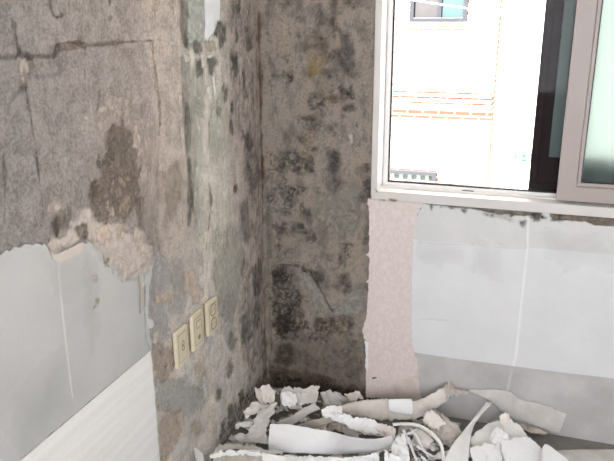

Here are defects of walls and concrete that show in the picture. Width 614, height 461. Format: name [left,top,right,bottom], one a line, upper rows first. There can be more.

crack [0,20,152,77]
leakage [308,0,353,79]
leakage [163,1,226,226]
leakage [232,57,254,117]
leakage [242,130,262,200]
leakage [270,152,314,213]
leakage [328,151,339,190]
flaking render [46,95,201,381]
leakage [276,203,315,246]
spalling [550,213,614,225]
leakage [269,265,353,366]
leakage [220,370,364,443]